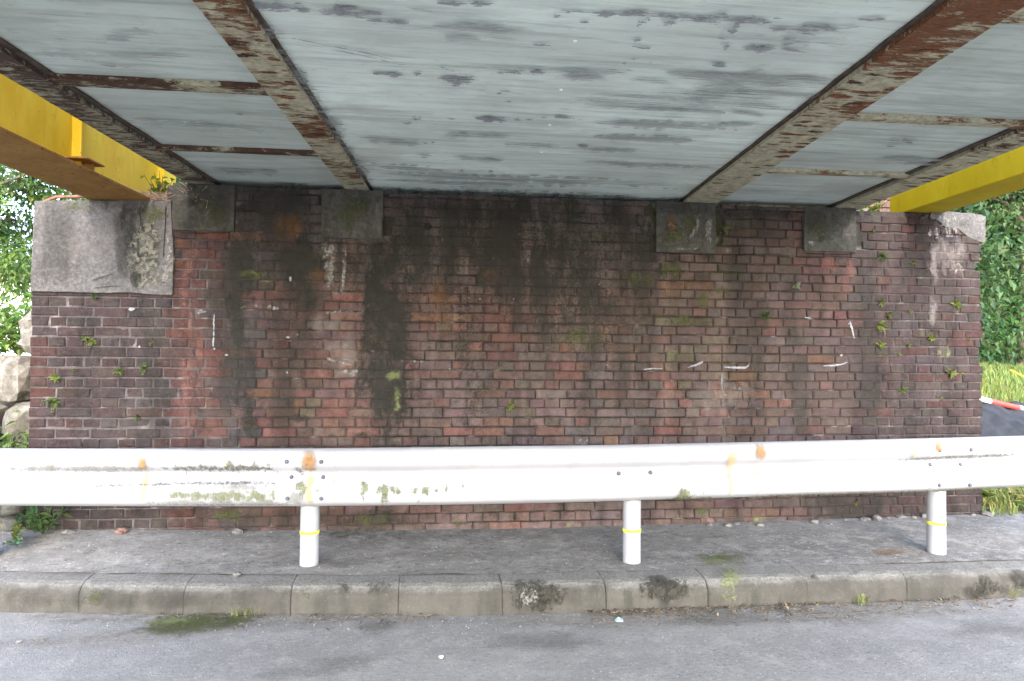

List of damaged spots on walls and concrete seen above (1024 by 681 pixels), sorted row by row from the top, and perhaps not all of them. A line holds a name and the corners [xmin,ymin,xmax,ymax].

damp [278,50,674,201]
damp [484,67,825,169]
damp [297,238,346,308]
damp [327,231,432,430]